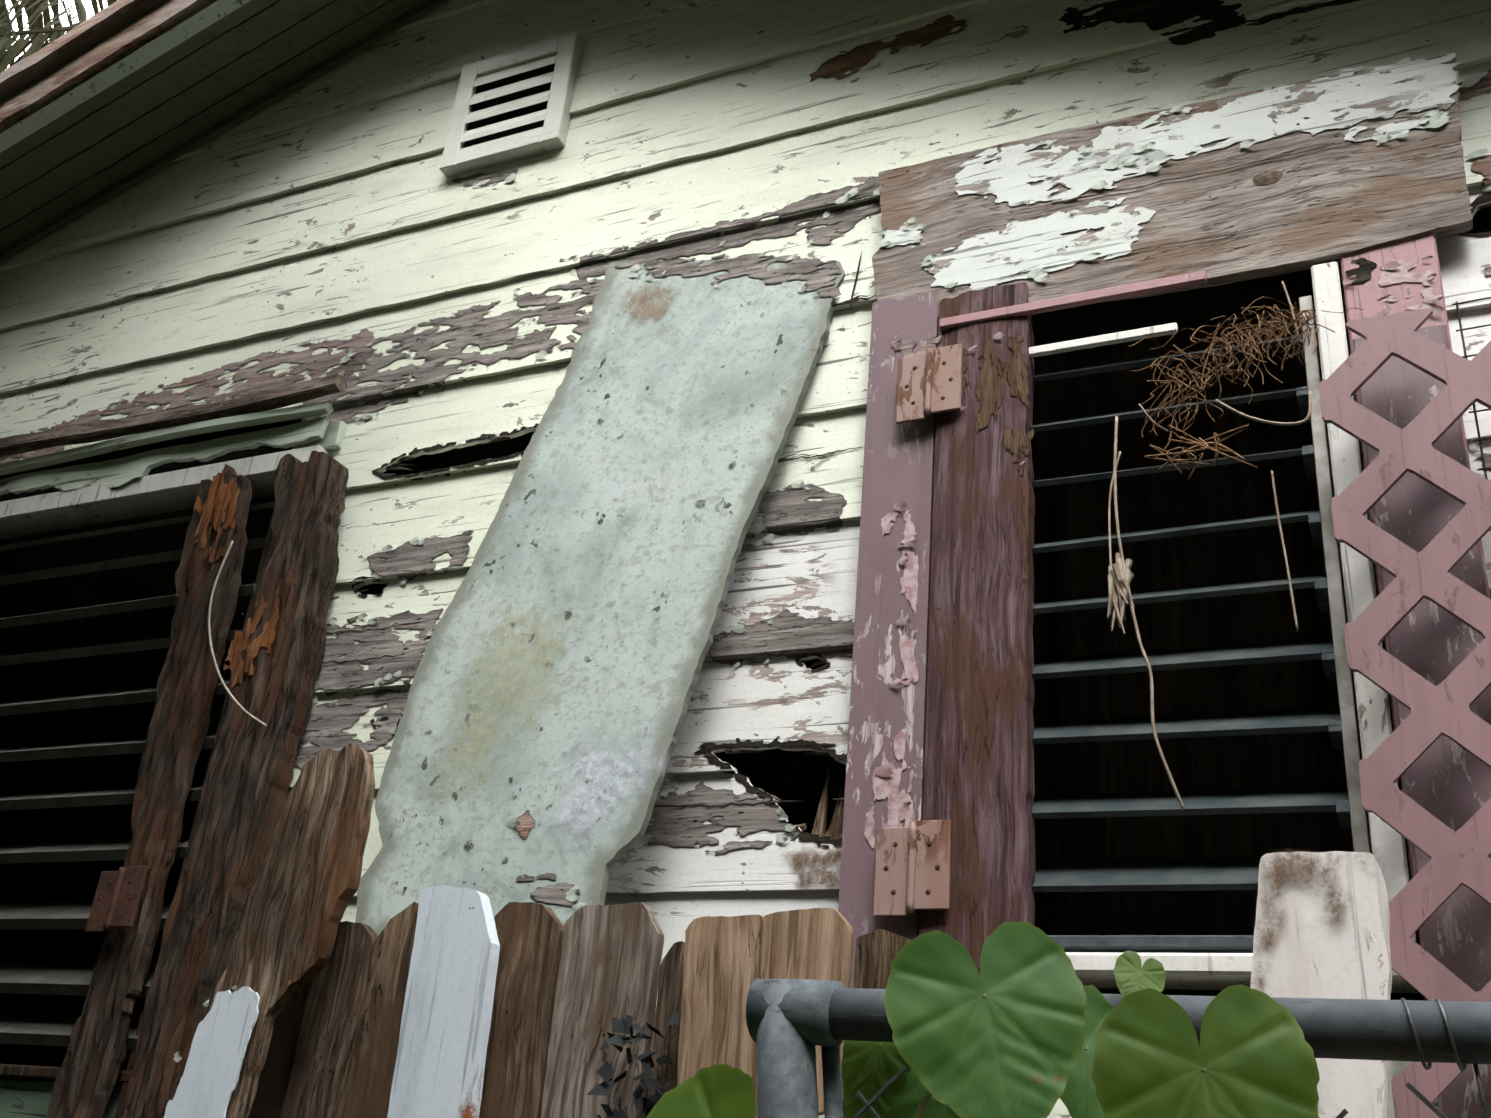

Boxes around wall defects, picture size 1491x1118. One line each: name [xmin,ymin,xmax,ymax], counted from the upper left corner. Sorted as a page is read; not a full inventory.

peeling [806,12,968,83]
peeling [0,48,1491,476]
spalling [372,423,539,486]
peeling [748,479,847,542]
peeling [294,530,473,769]
peeling [708,609,855,671]
peeling [881,500,919,689]
peeling [638,736,847,854]
peeling [864,729,915,848]